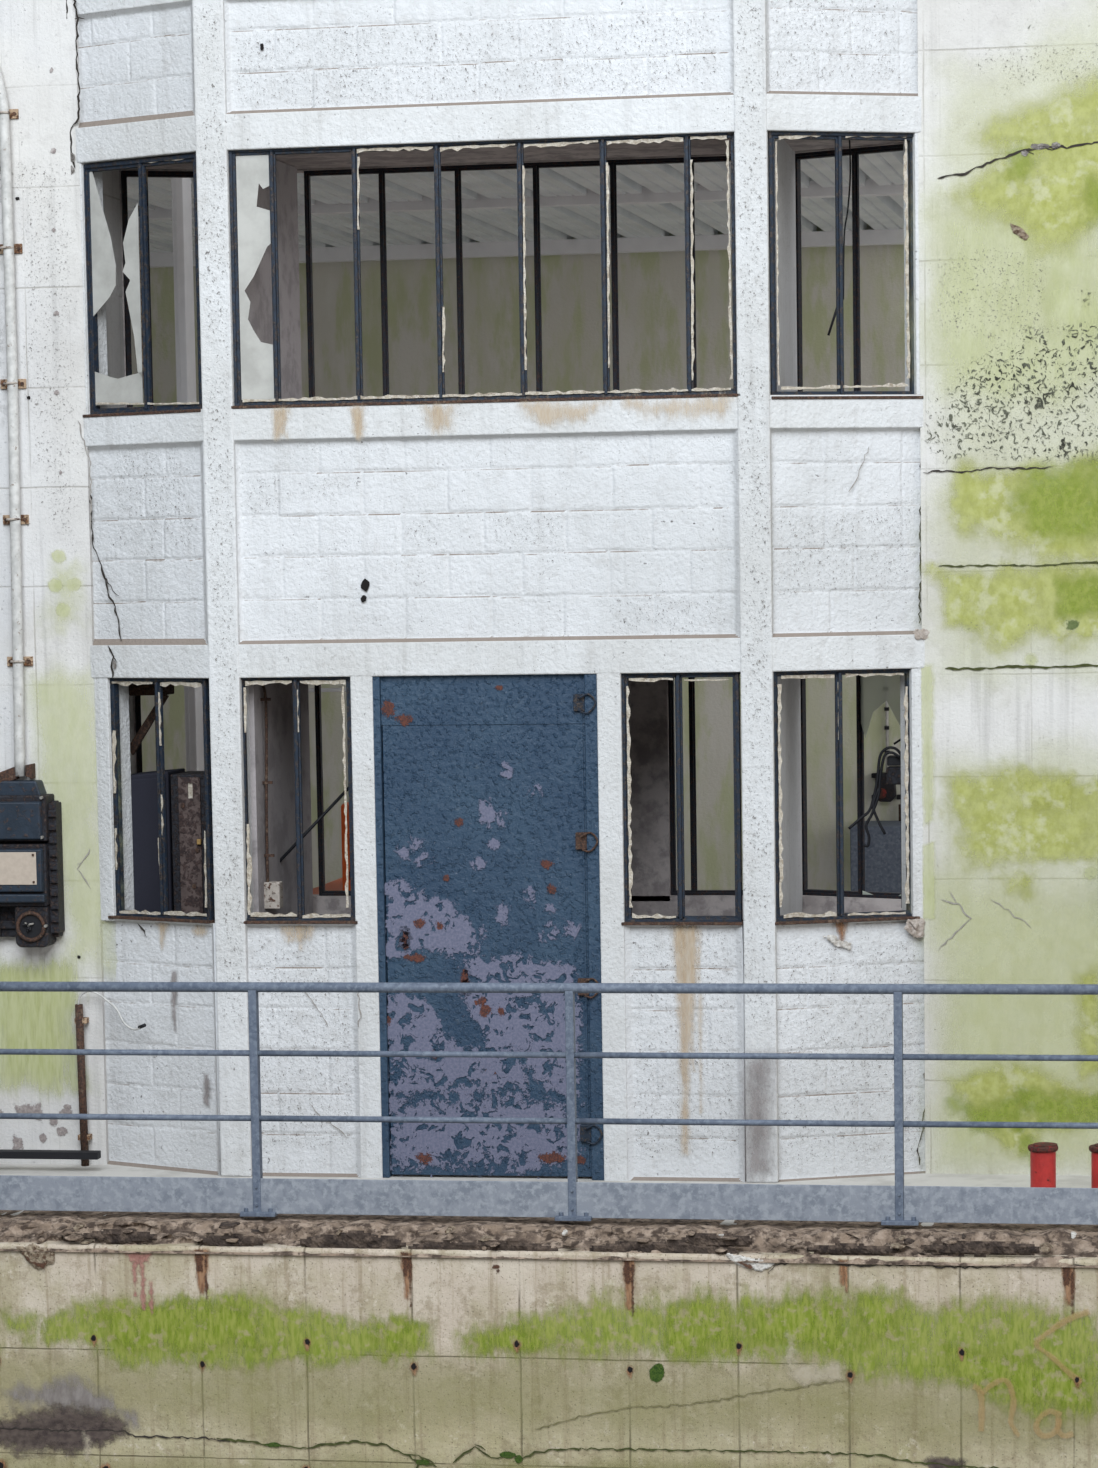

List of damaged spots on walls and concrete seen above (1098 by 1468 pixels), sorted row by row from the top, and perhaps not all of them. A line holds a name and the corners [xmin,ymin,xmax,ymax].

crack [66,0,84,175]
crack [937,141,1098,179]
crack [78,421,122,678]
peeling [500,761,513,779]
peeling [470,797,509,871]
peeling [385,835,586,1179]
rust [675,926,696,1089]
peeling [0,1103,73,1150]
rust [194,1249,209,1299]
damp [788,1347,840,1384]
damp [0,1378,137,1459]
crack [0,1380,998,1468]